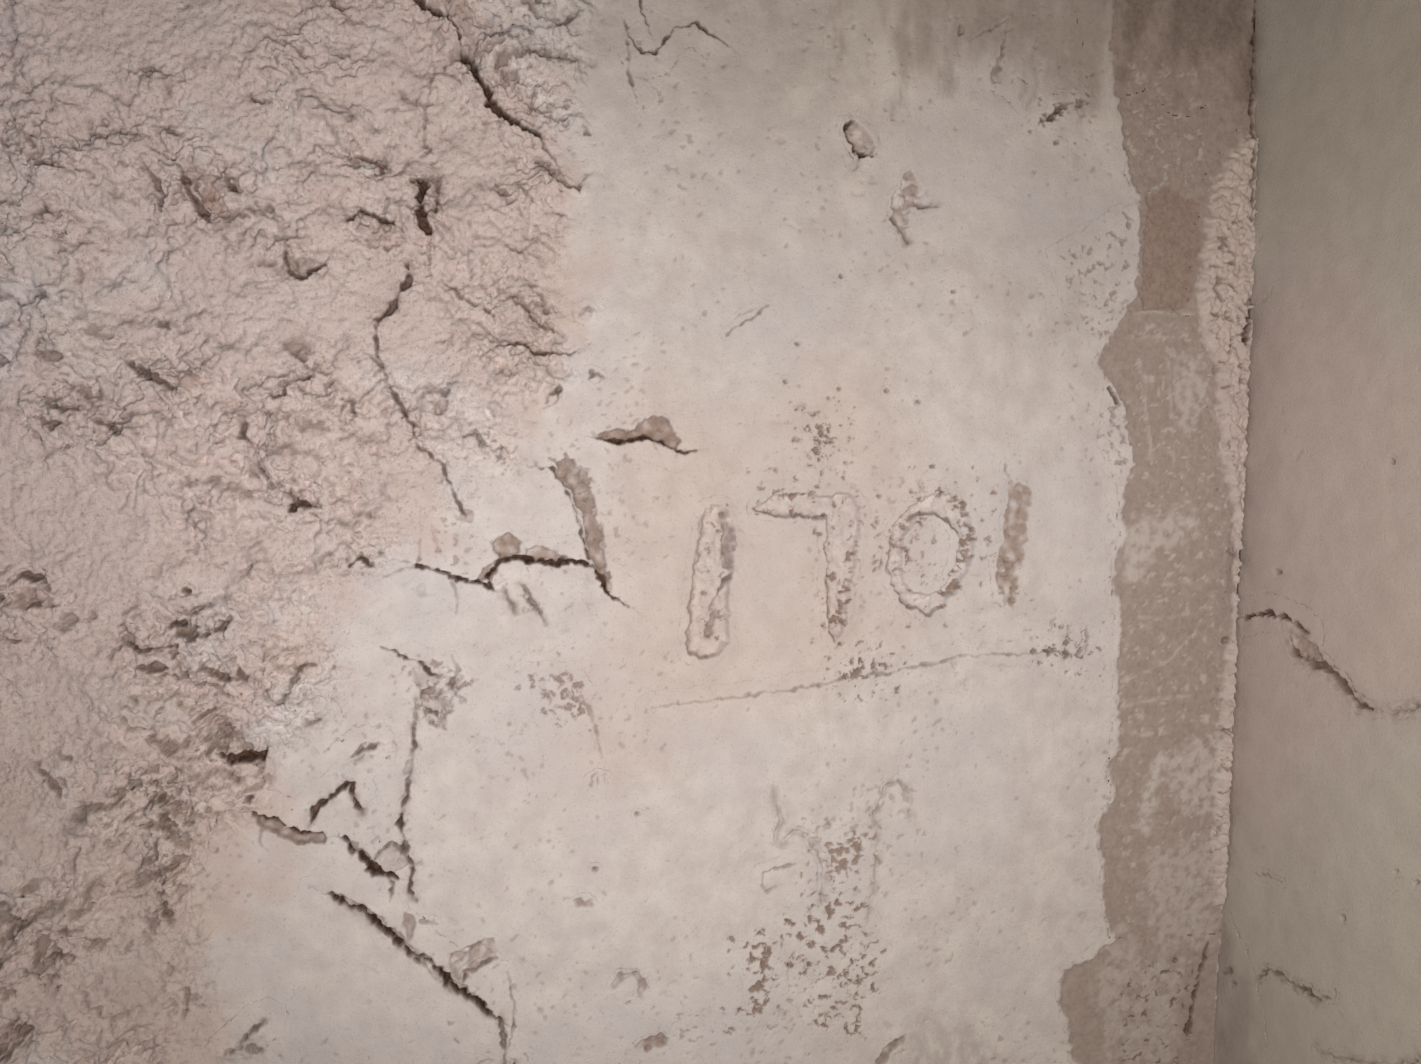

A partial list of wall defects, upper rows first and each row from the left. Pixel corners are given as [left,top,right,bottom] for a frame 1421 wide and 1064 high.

crack [531,0,749,111]
crack [224,0,653,1064]
crack [696,562,745,621]
peeling [1025,79,1256,1064]
crack [1236,591,1421,724]
crack [1255,961,1421,1064]